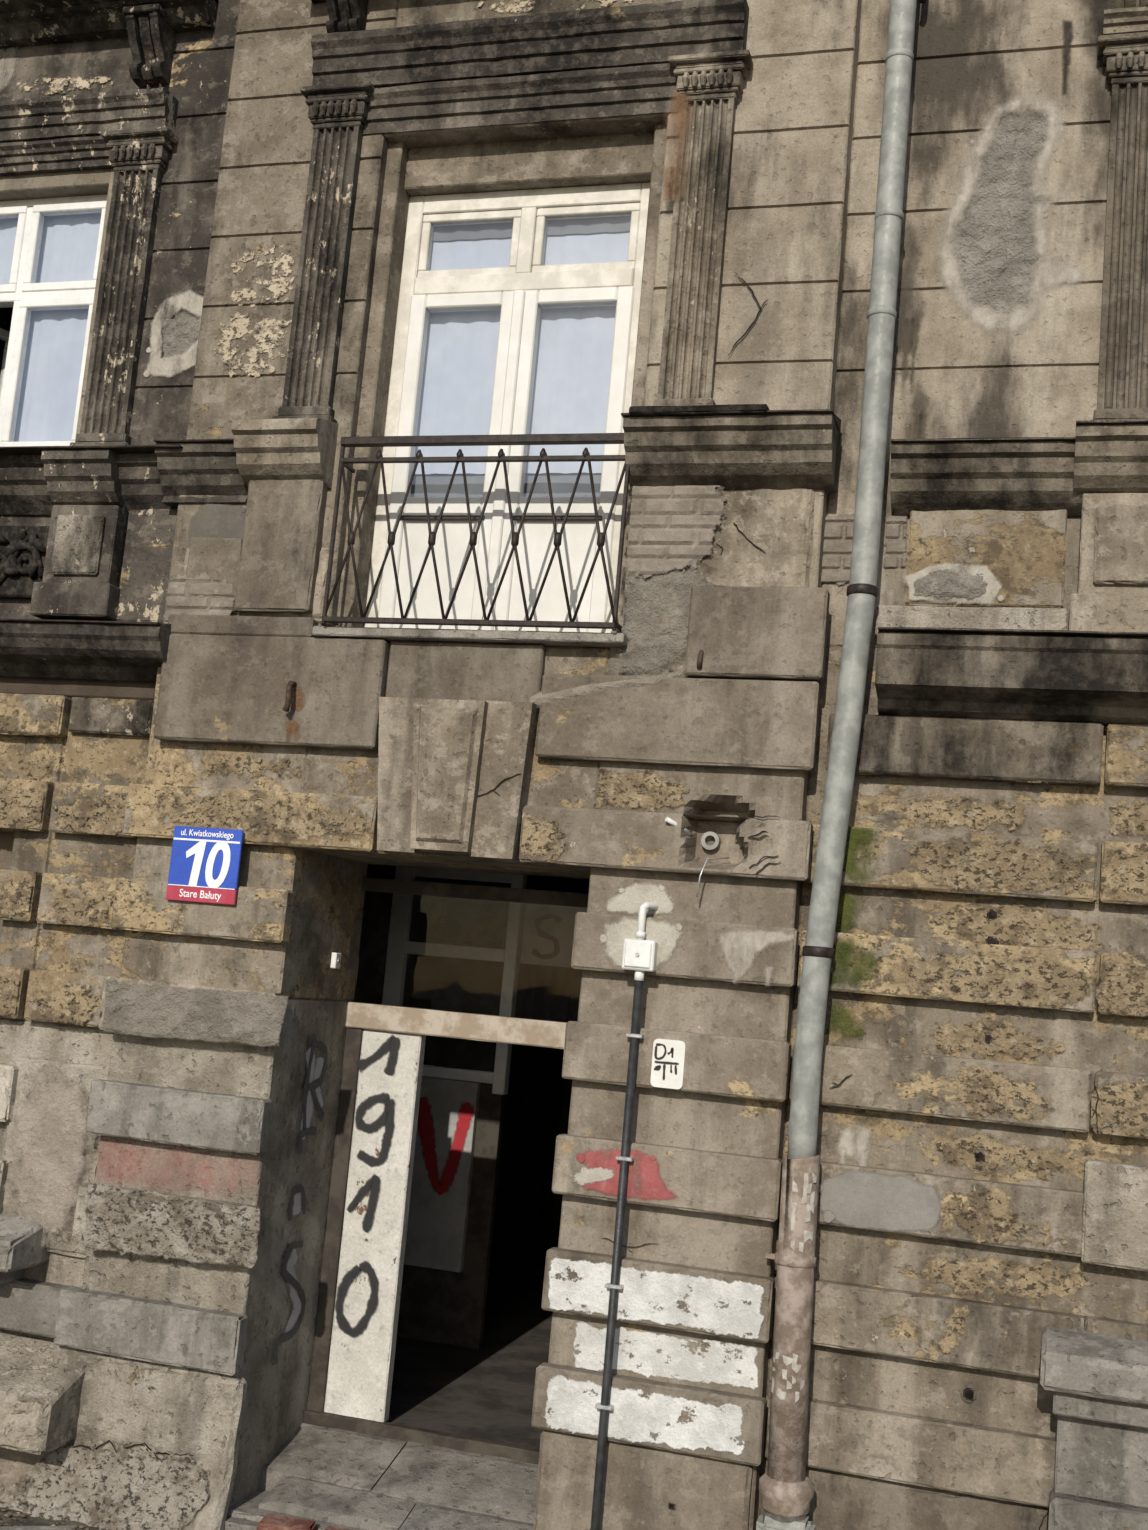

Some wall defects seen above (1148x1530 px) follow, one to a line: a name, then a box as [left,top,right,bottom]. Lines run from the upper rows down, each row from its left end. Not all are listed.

peeling [17,76,113,94]
damp [1063,21,1072,93]
spalling [940,98,1081,332]
spalling [143,245,295,377]
damp [893,232,926,433]
flaking render [607,485,726,676]
spalling [0,1439,208,1530]